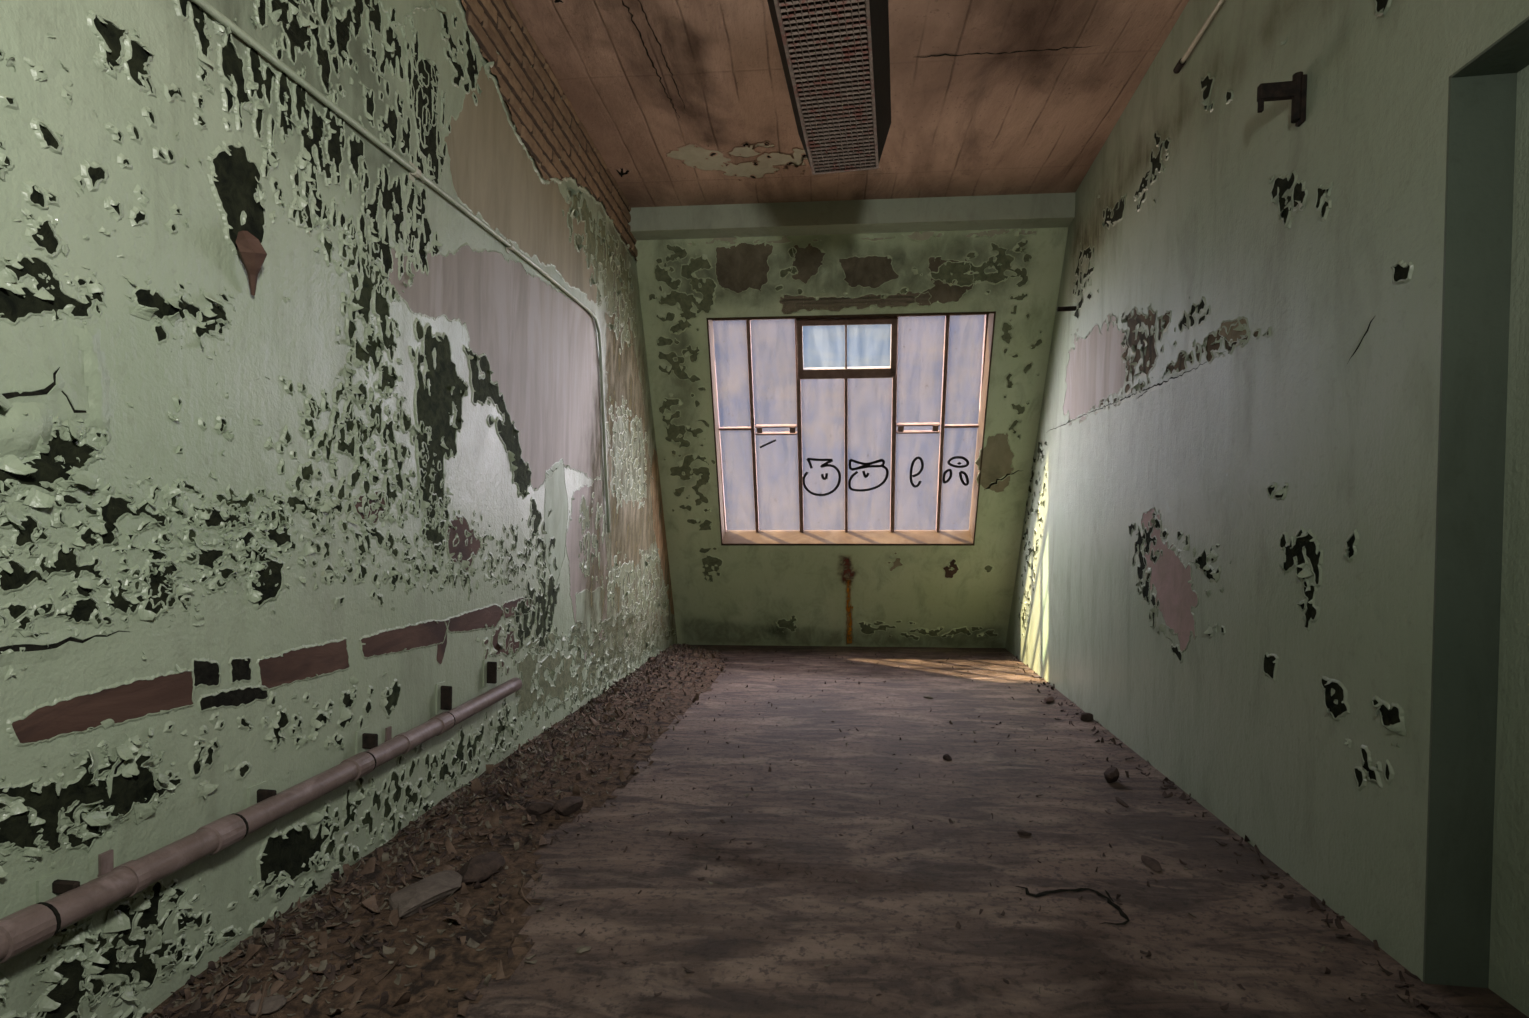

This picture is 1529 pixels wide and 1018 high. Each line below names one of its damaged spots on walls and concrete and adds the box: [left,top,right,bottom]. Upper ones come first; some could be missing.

peeling [1269,170,1333,230]
flaking render [1063,131,1271,427]
flaking render [0,0,1048,1018]
rust [840,557,856,644]
flaking render [1128,507,1232,664]
peeling [1279,526,1323,631]
peeling [1344,528,1359,563]
peeling [1262,652,1279,682]
peeling [1320,676,1350,721]
peeling [1344,695,1406,792]